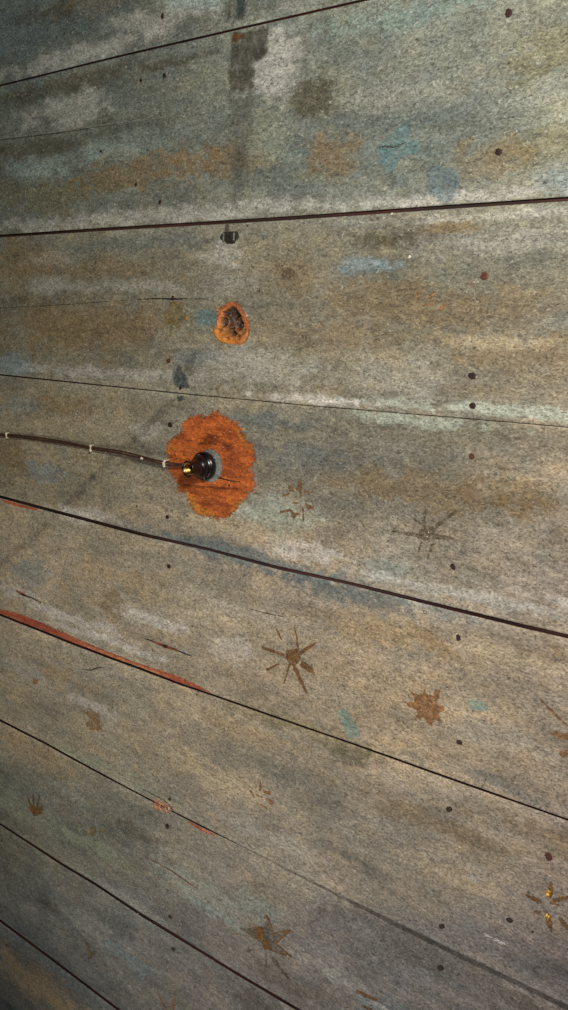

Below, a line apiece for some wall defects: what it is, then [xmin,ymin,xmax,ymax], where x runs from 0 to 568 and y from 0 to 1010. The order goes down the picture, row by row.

water stain [229,28,268,89]